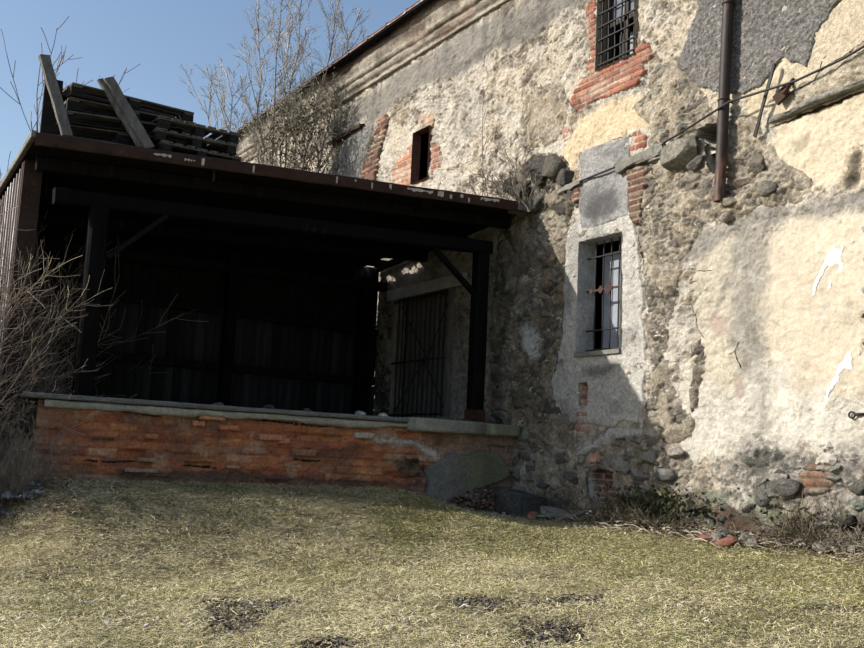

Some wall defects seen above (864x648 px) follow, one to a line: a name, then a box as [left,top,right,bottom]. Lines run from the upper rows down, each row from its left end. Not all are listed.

spalling [418,113,435,128]
spalling [392,144,413,186]
spalling [430,144,443,180]
spalling [484,0,864,551]